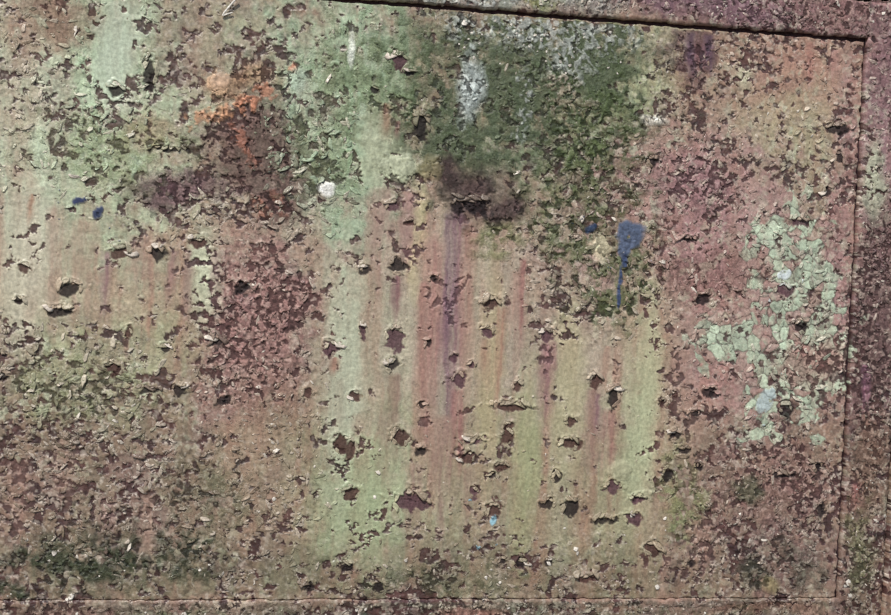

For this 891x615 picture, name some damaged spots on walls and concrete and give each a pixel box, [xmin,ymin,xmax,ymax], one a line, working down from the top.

peeling [0,0,173,214]
corrosion [25,50,325,454]
peeling [0,255,367,592]
corrosion [322,355,347,468]
corrosion [360,151,533,552]
peeling [109,38,857,615]
corrosion [534,340,560,428]
corrosion [581,345,623,487]
corrosion [616,0,891,597]